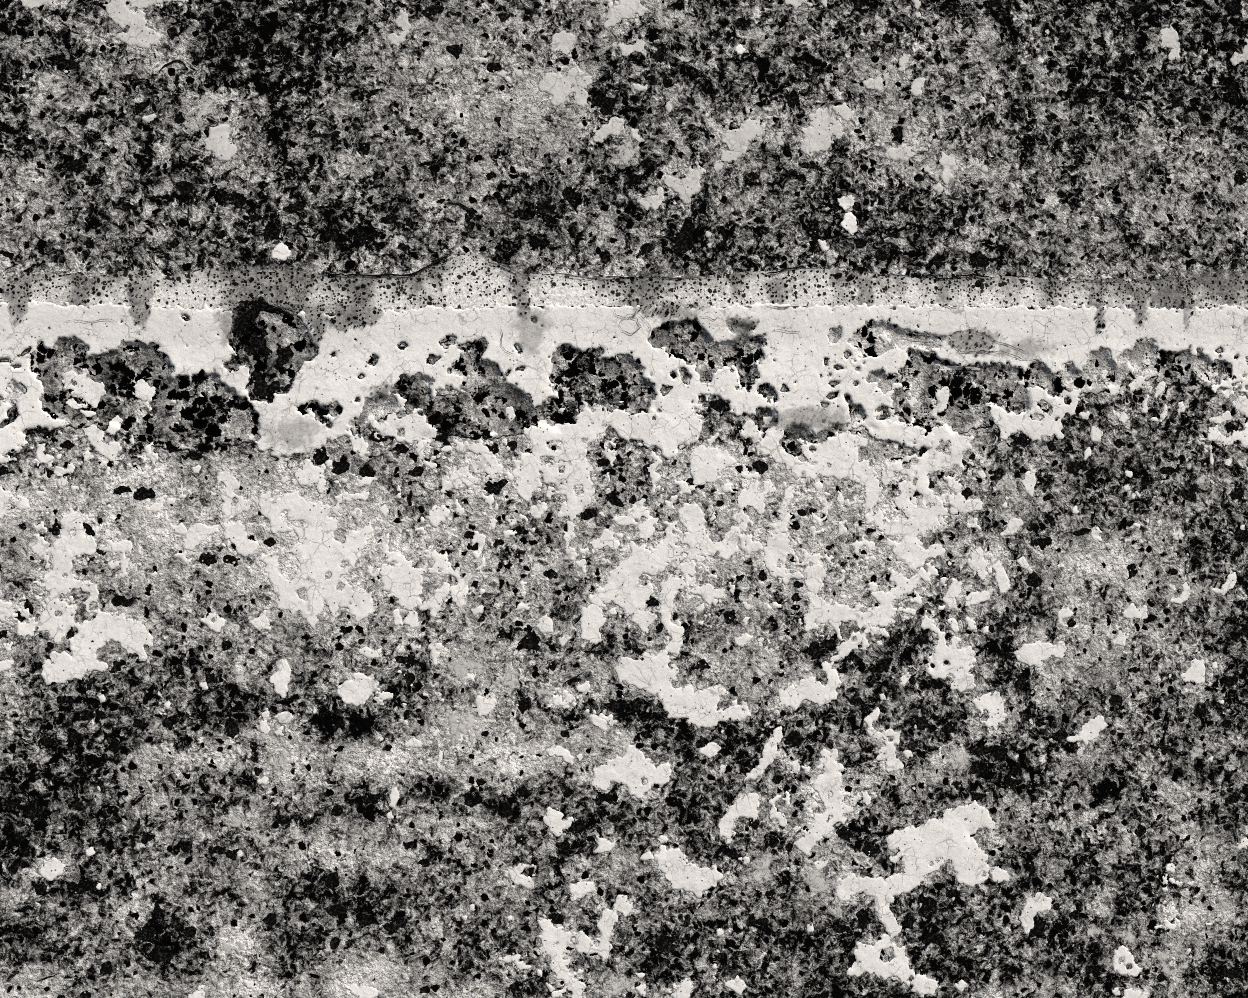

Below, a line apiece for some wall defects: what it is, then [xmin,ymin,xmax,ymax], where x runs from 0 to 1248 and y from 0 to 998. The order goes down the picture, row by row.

leakage [3,271,32,324]
leakage [67,281,98,305]
leakage [125,273,156,329]
leakage [215,263,383,345]
leakage [510,273,532,316]
leakage [630,269,709,319]
leakage [761,276,793,305]
leakage [853,272,878,307]
leakage [935,274,952,306]
leakage [1086,278,1108,333]
leakage [1128,275,1197,327]
peeling [0,299,1248,998]